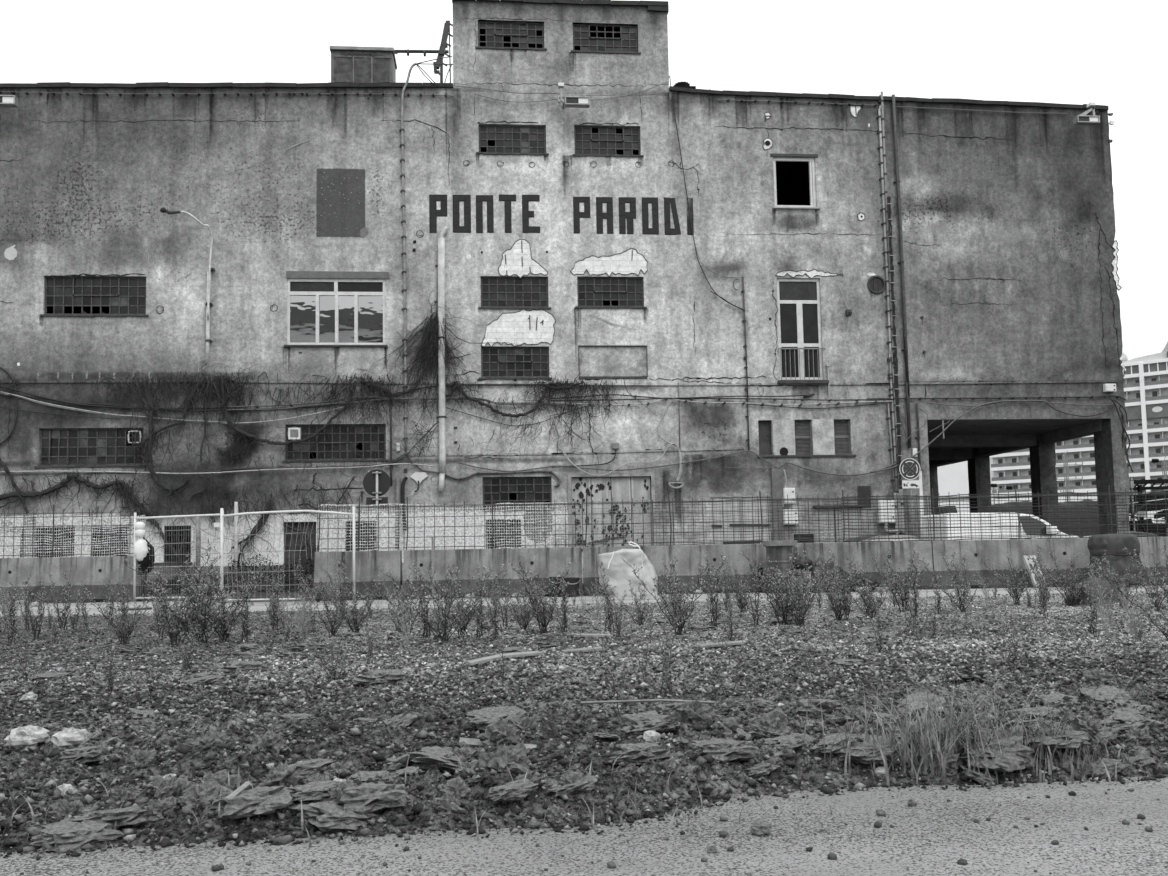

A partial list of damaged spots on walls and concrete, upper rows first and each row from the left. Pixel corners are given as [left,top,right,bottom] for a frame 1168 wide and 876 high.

spalling [498,239,549,278]
spalling [570,248,648,277]
spalling [775,269,843,279]
spalling [481,309,556,347]